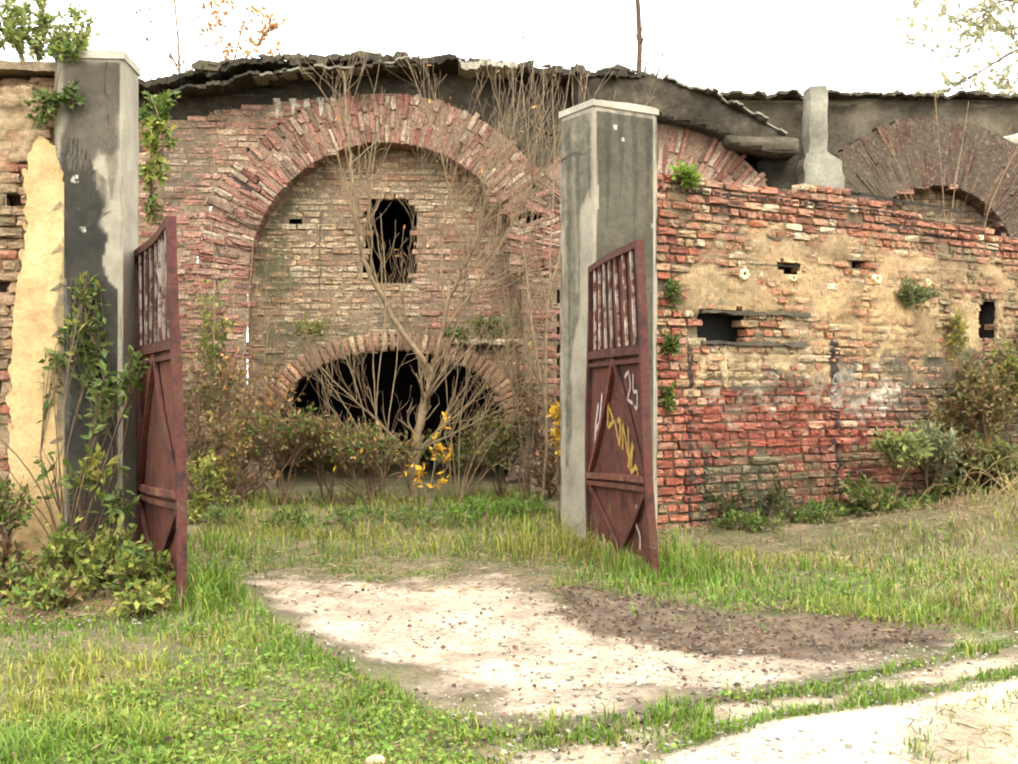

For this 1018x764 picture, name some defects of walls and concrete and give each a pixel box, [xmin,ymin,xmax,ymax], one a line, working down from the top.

flaking render [6,136,78,569]
damp [50,138,118,561]
spalling [697,313,745,342]
spalling [978,301,994,338]